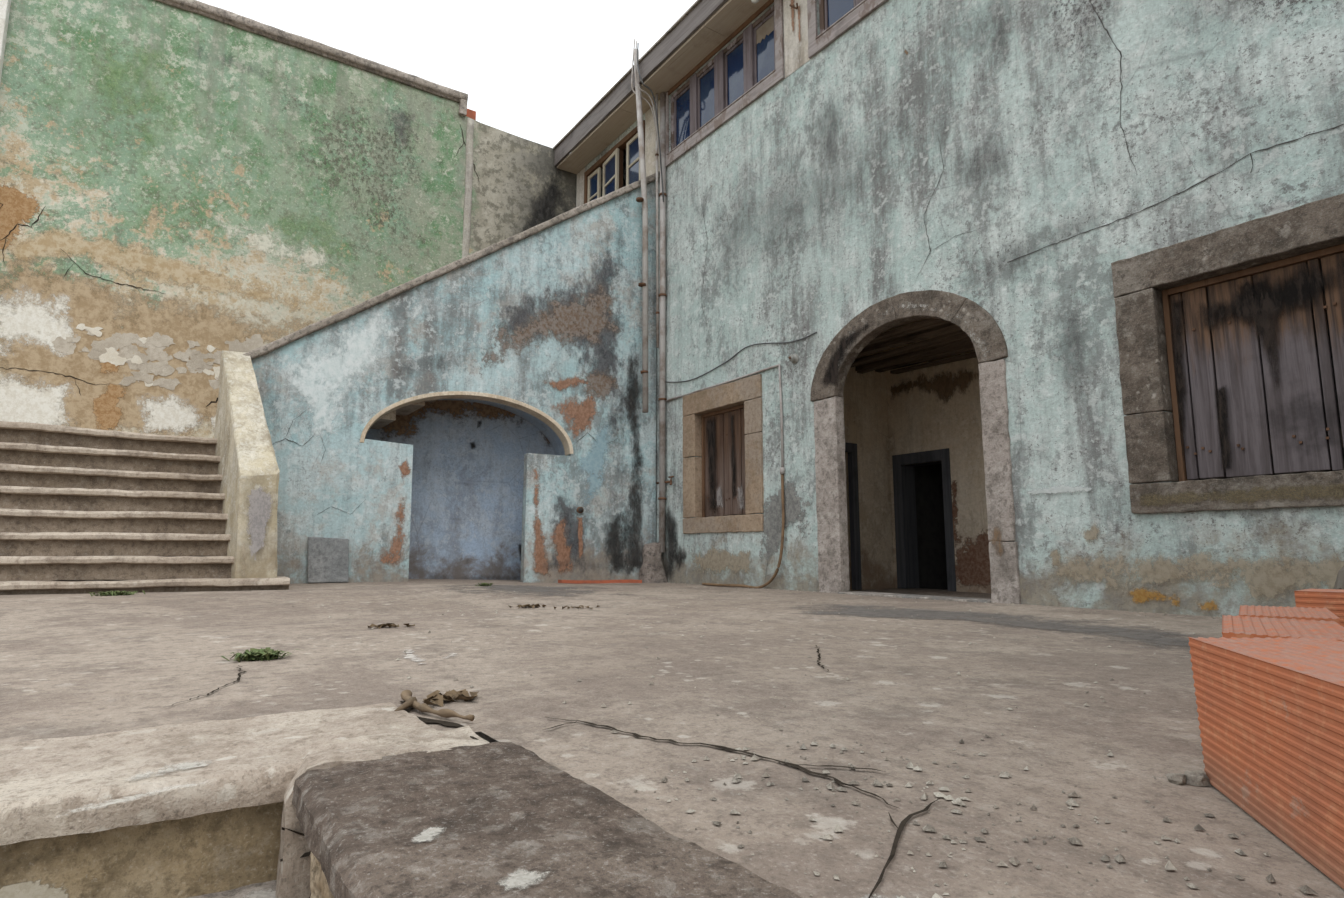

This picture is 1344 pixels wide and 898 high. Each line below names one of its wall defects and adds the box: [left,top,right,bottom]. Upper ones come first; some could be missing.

crack [1070,0,1137,175]
crack [60,248,164,294]
crack [915,129,975,281]
crack [1007,124,1344,263]
crack [0,367,110,395]
peeling [0,261,308,436]
peeling [549,370,618,438]
water stain [606,345,642,571]
peeling [951,481,991,589]
crack [280,827,311,862]